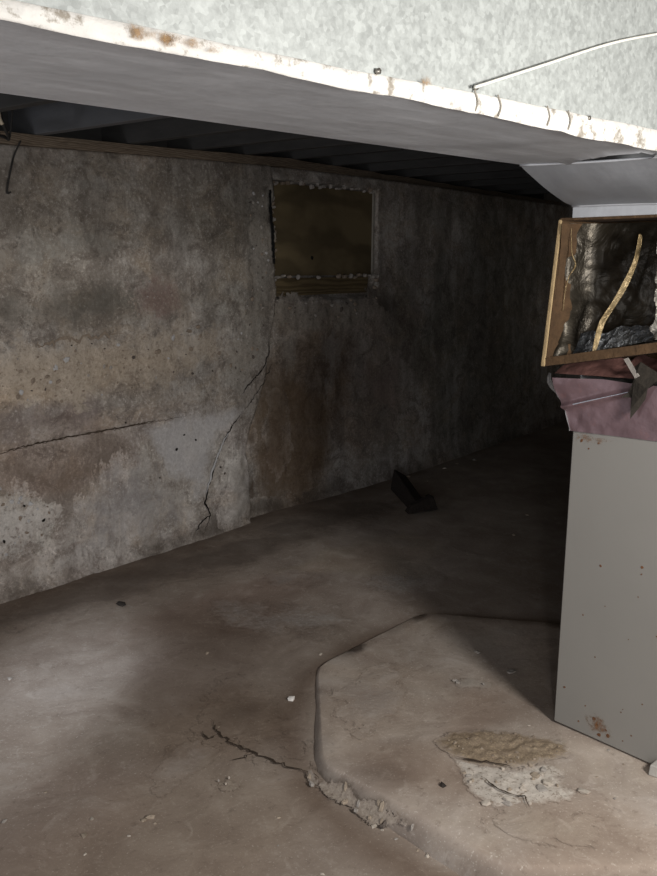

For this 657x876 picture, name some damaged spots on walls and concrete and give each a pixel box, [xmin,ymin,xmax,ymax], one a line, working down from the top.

corrosion [132,26,177,45]
crack [1,417,182,454]
crack [195,337,272,534]
crack [202,718,321,780]
spalling [433,728,578,808]
spalling [307,770,414,831]